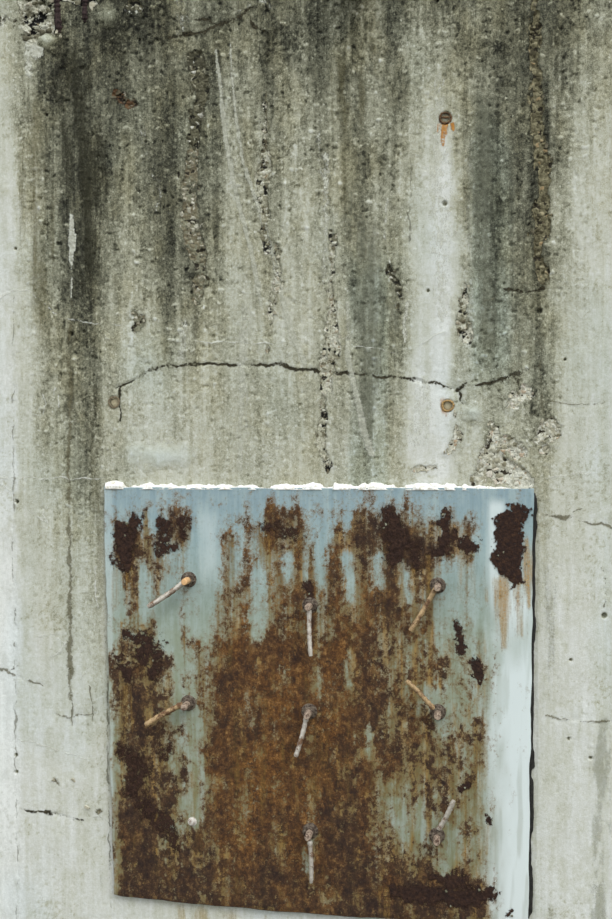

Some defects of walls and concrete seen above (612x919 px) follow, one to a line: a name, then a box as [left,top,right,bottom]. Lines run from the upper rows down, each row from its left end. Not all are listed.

damp [24,33,43,76]
spalling [17,0,98,45]
damp [61,46,105,290]
spalling [527,0,554,285]
damp [215,44,307,365]
crack [116,361,540,422]
spalling [470,416,561,489]
corrosion [109,511,192,573]
corrosion [377,502,533,633]
crack [546,508,612,529]
corrosion [452,619,486,685]
crack [24,809,84,821]